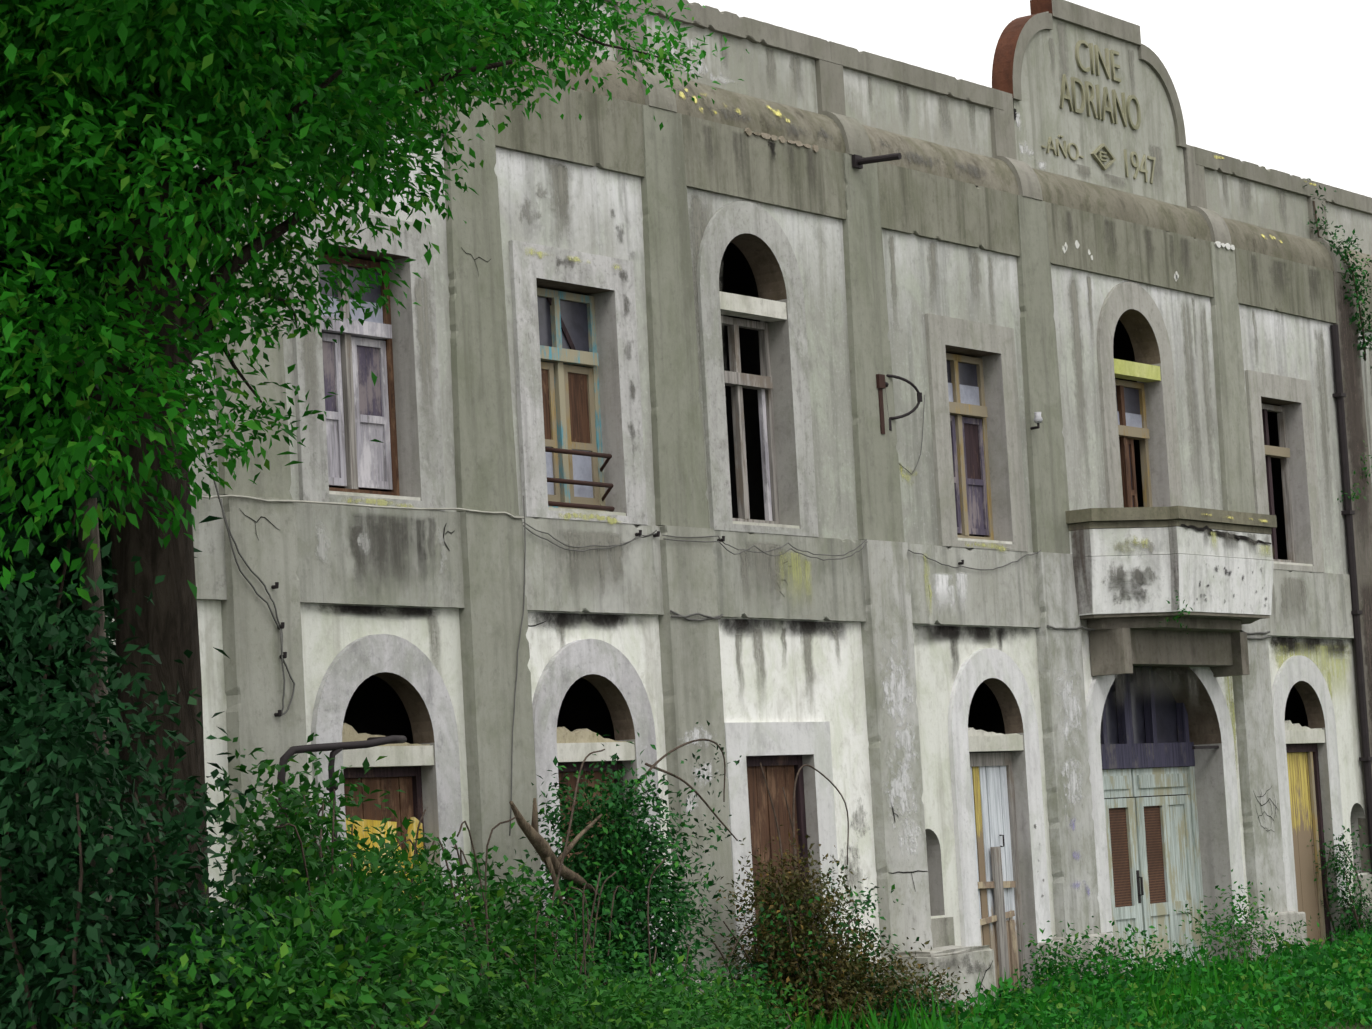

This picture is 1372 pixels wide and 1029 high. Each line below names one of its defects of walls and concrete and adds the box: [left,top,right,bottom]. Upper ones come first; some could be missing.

crack [239,508,280,540]
leakage [1110,540,1155,600]
leakage [724,619,840,680]
leakage [1272,637,1345,694]